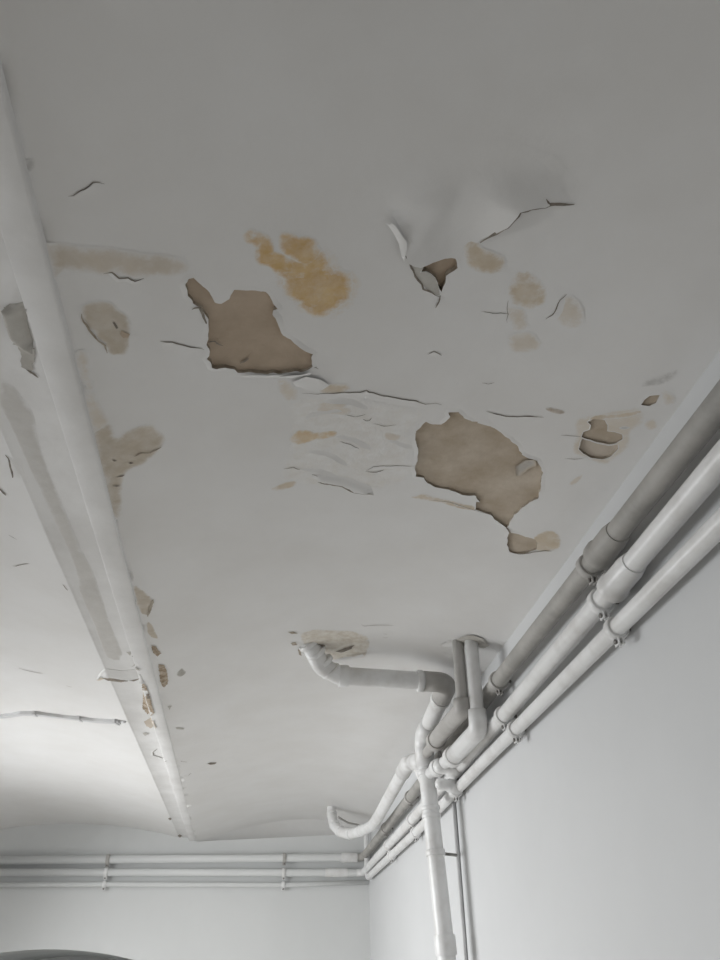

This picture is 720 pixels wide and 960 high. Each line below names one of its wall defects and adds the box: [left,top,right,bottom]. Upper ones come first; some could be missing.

leakage [242,228,362,320]
spalling [405,256,462,307]
leakage [463,241,506,275]
flaking render [1,302,38,378]
leakage [74,349,166,520]
spalling [179,274,561,556]
crack [308,390,441,427]
crack [478,411,544,426]
spalling [572,392,662,465]
spalling [129,570,168,687]